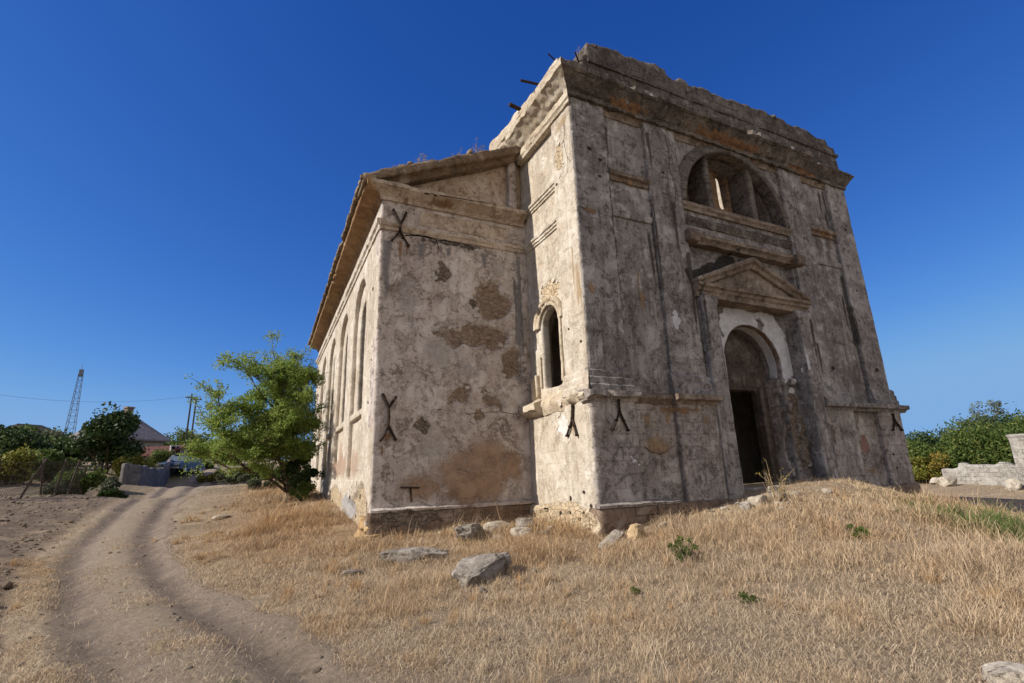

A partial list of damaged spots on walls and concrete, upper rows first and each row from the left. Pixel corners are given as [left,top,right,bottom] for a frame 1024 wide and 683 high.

crack [406,234,473,250]
peeling [671,310,683,329]
spalling [431,283,527,423]
peeling [719,308,811,394]
spalling [413,418,430,434]